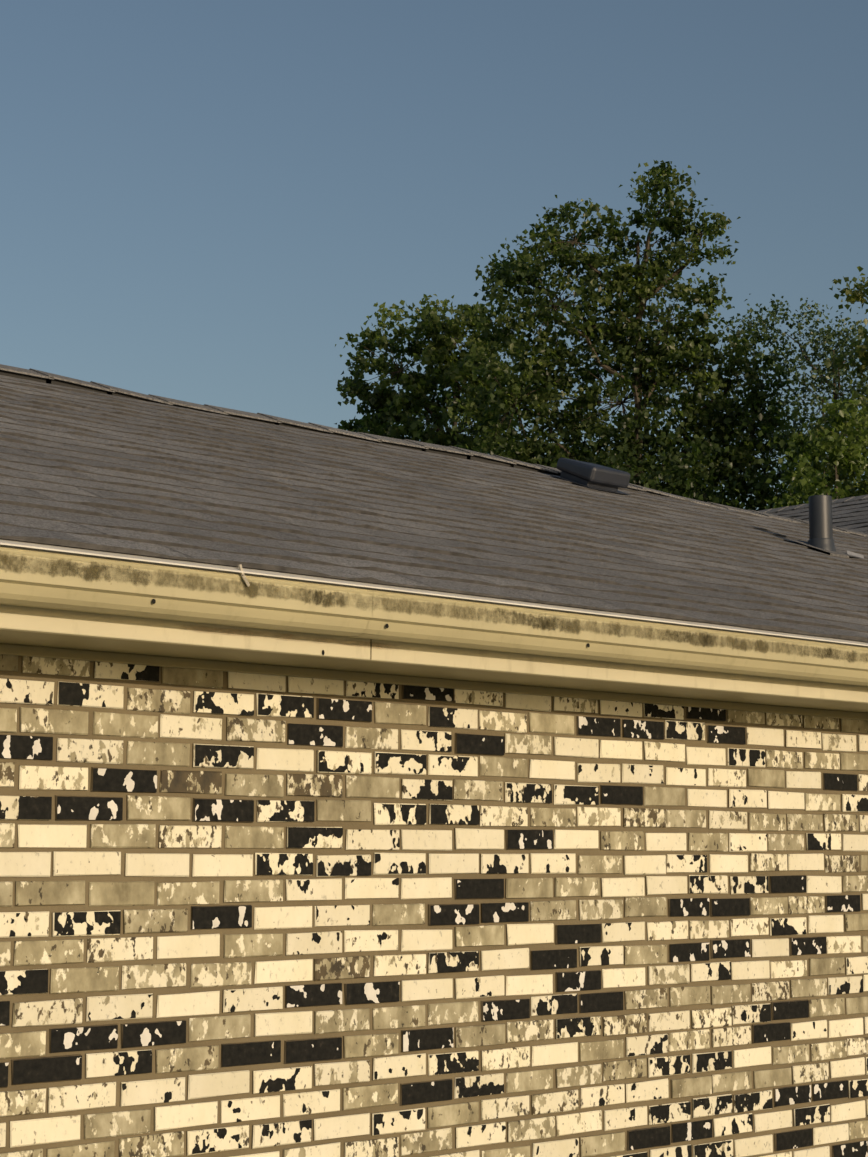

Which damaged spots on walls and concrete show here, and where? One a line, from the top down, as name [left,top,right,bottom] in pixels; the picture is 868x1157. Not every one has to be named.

leakage [36,560,369,608]
leakage [382,598,867,662]
flaking render [0,768,157,820]
peeling [195,683,504,848]
peeling [507,764,664,805]
flaking render [578,701,765,766]
peeling [195,799,426,894]
peeling [54,911,121,936]
flaking render [266,981,400,1007]
flaking render [222,1038,342,1093]
flaking render [374,1027,504,1135]
peeling [617,1035,868,1157]